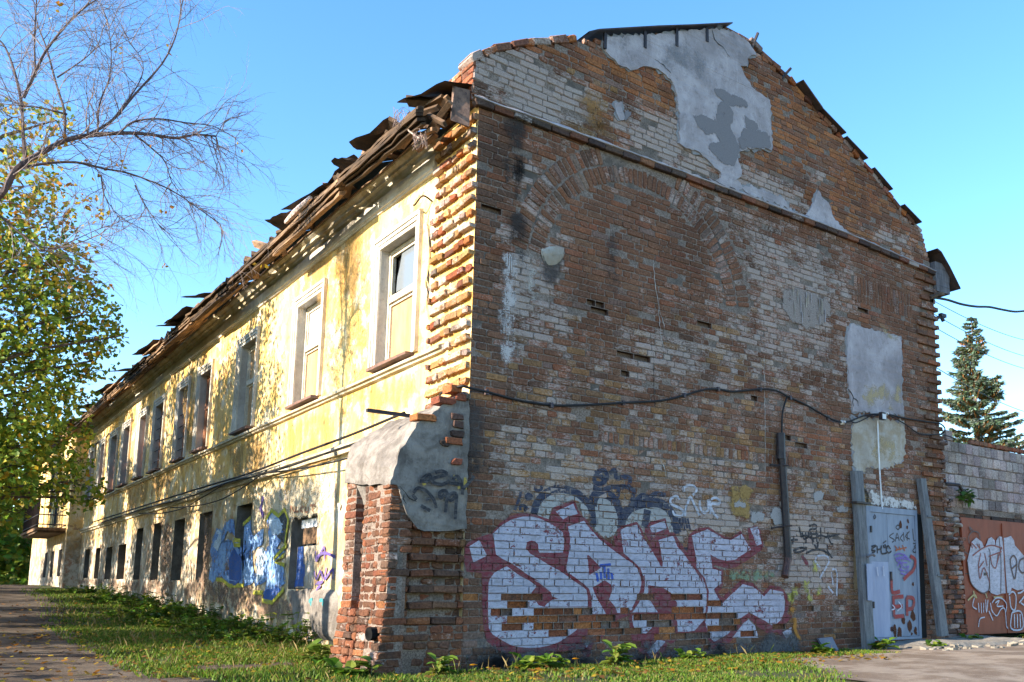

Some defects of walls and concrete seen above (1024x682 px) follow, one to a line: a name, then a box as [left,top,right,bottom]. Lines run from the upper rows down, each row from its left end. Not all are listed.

leakage [504,118,526,199]
flaking render [600,28,848,232]
leakage [500,213,536,363]
flaking render [410,384,467,465]